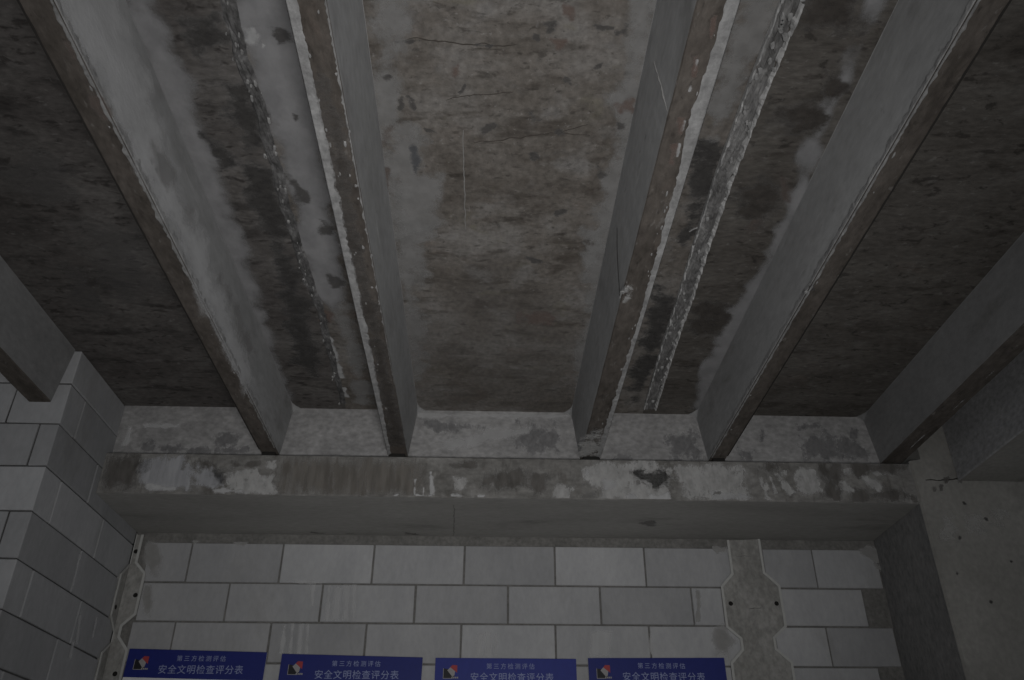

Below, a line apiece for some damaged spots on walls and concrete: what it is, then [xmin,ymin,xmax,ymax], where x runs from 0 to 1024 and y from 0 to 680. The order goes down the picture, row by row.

water stain [50,0,444,496]
crack [393,37,517,47]
water stain [575,0,657,379]
water stain [596,0,775,460]
water stain [663,0,981,461]
water stain [737,422,918,503]